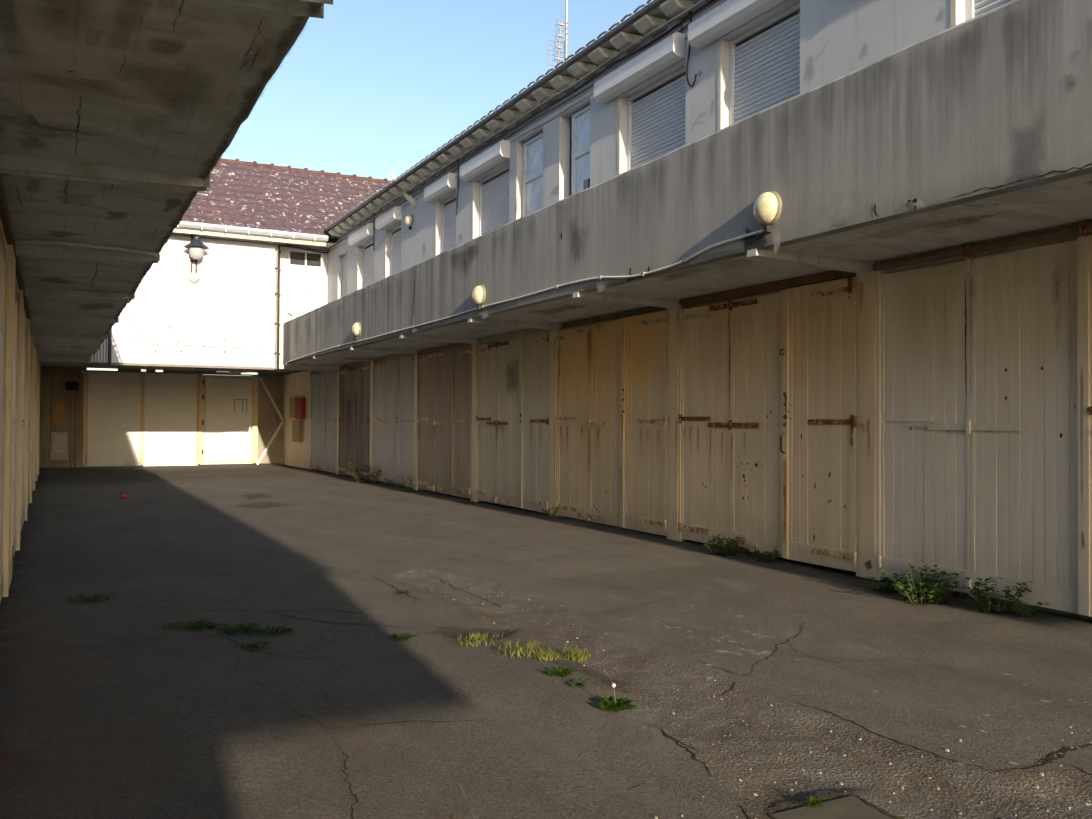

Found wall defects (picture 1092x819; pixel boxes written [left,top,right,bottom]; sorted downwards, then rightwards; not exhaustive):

crack [74,94,82,156]
crack [281,700,491,819]
crack [796,702,1092,775]